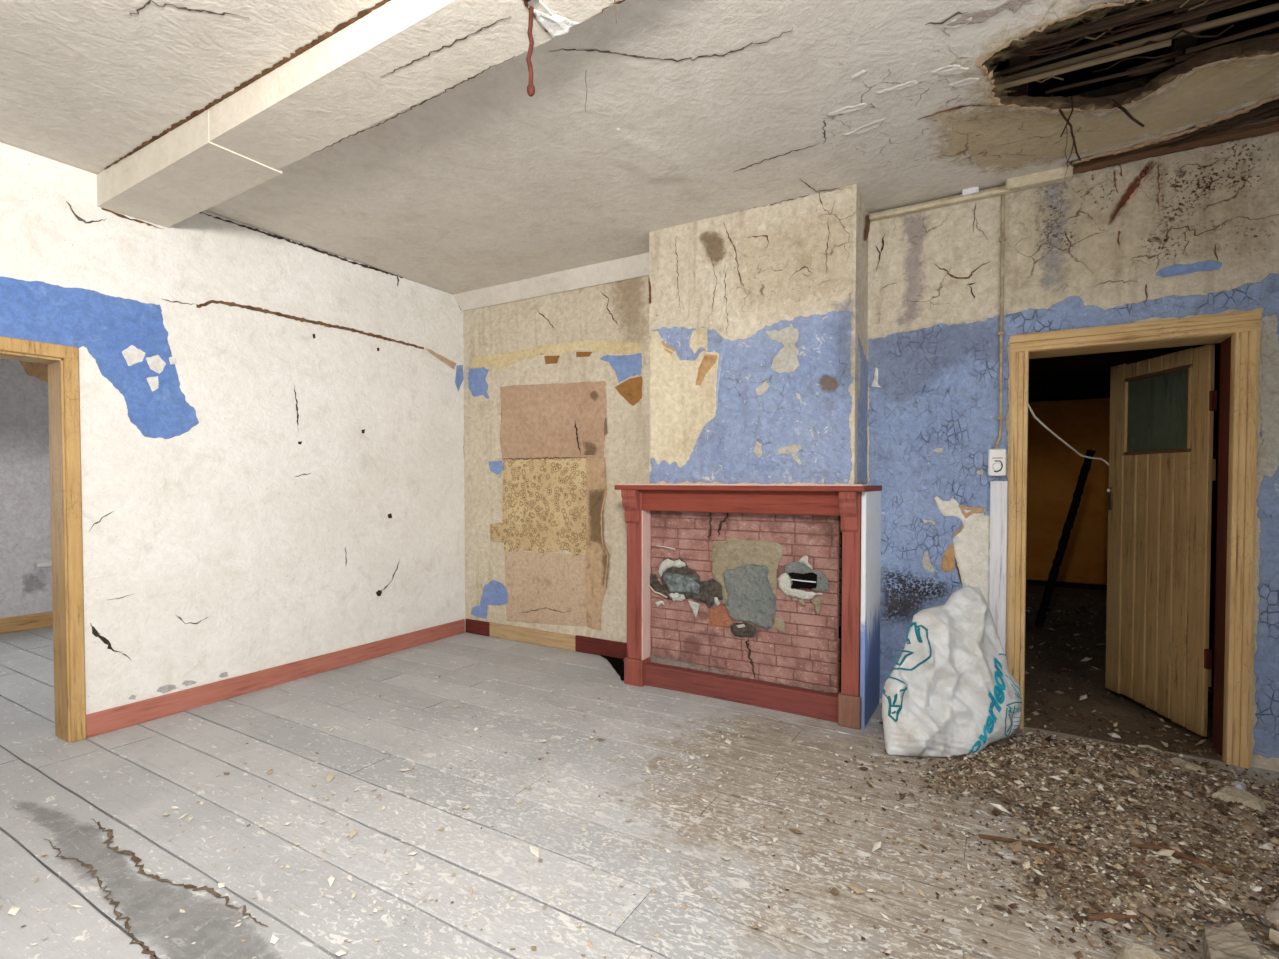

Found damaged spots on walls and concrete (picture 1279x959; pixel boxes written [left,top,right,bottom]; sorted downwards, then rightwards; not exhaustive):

crack [105,0,391,169]
crack [381,0,793,77]
crack [200,212,403,286]
rust [1110,162,1161,246]
peeling [0,277,199,439]
crack [163,299,456,369]
peeling [455,365,489,399]
peeling [576,273,1279,758]
damp [884,573,944,621]
peeling [242,670,759,946]
damp [44,839,156,959]
damp [93,819,268,927]